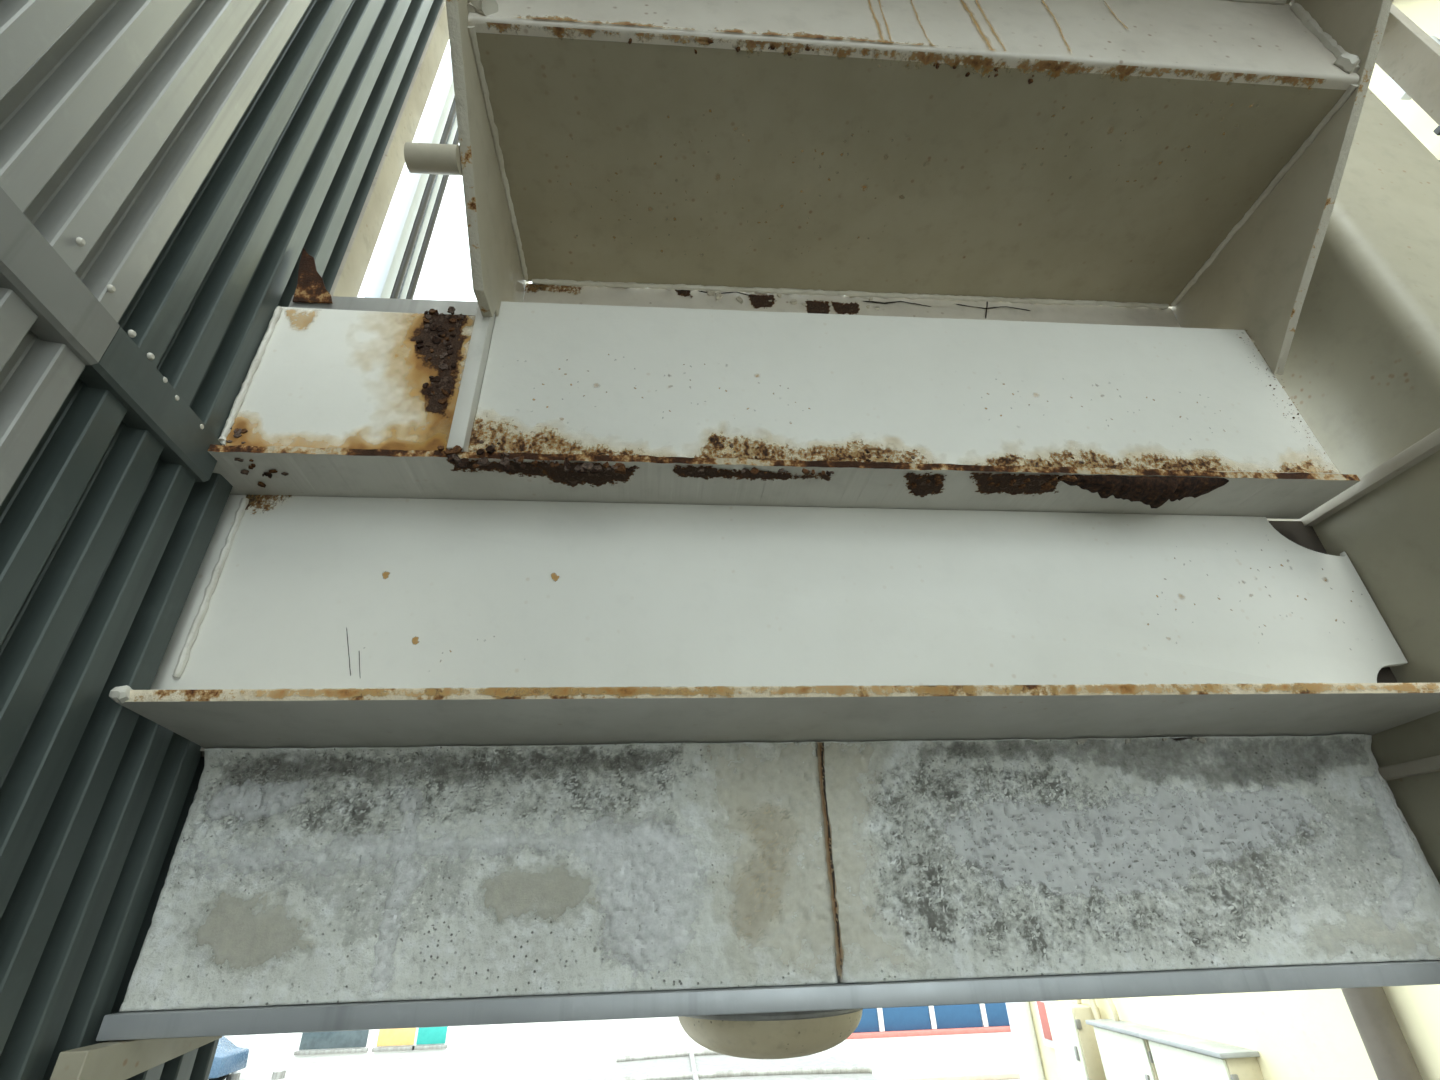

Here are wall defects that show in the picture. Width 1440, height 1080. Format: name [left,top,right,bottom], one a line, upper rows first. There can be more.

corrosion [487,0,1324,90]
corrosion [220,306,640,514]
corrosion [663,433,947,497]
corrosion [969,330,1334,496]
corrosion [241,688,462,699]
corrosion [480,683,1438,698]
damp [209,760,378,823]
damp [212,790,698,992]
damp [726,770,803,935]
crack [817,742,844,977]
damp [946,739,1360,898]
damp [1362,774,1419,928]